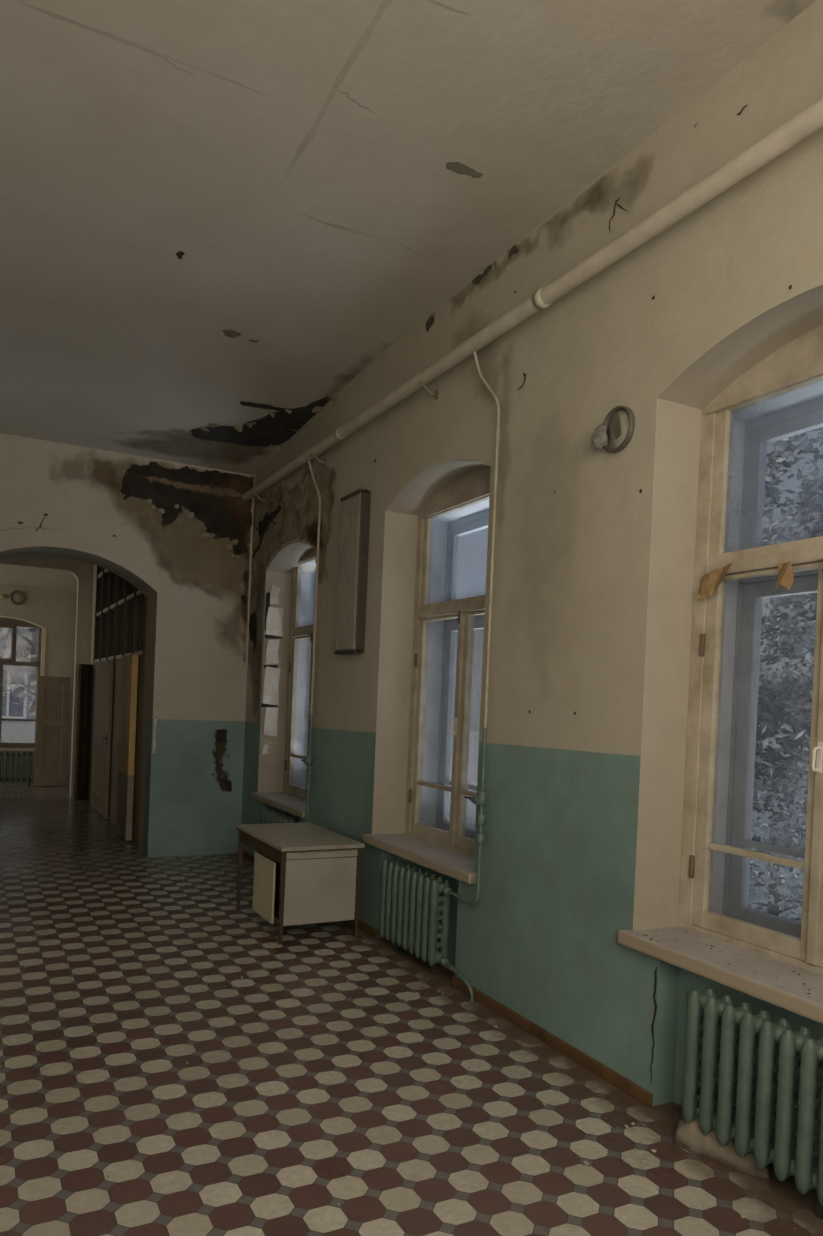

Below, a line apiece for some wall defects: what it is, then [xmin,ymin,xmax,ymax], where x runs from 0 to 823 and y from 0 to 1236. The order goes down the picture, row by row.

peeling [190,394,336,447]
flaking render [121,461,335,755]